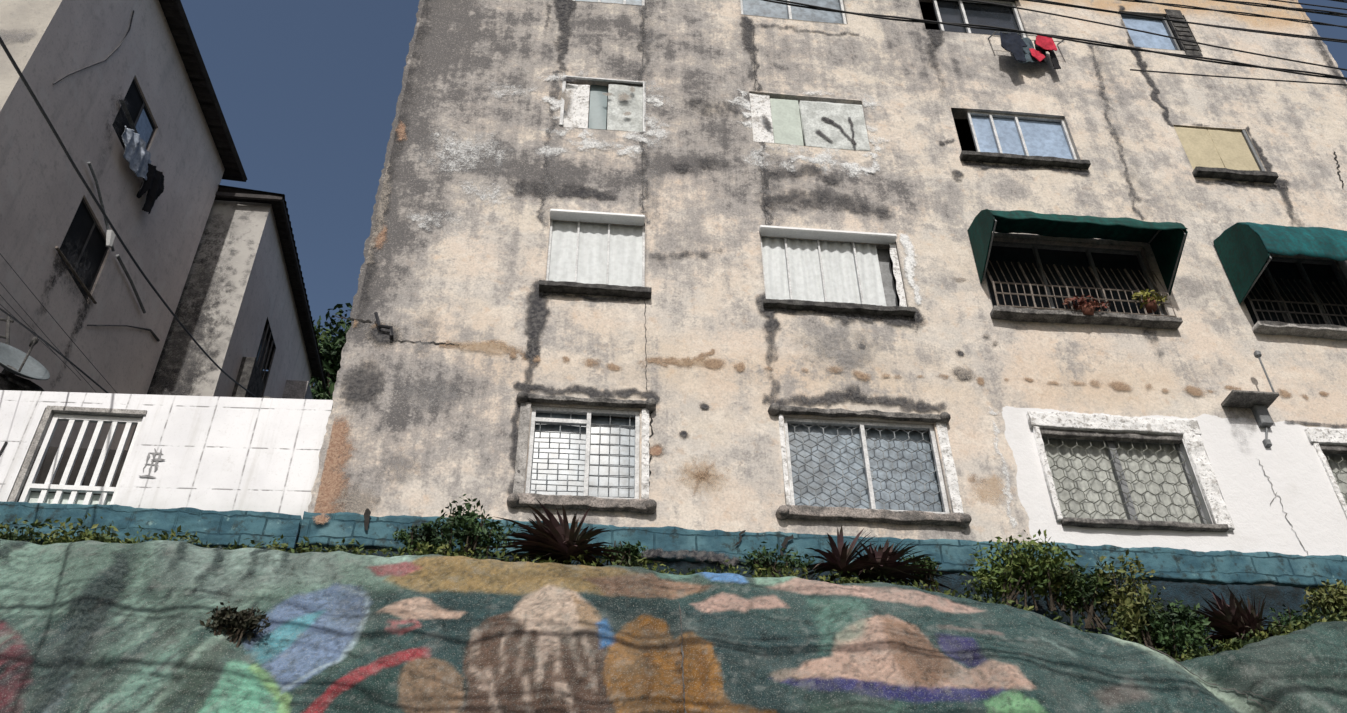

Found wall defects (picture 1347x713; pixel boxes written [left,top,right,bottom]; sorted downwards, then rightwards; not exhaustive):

peeling [495,75,667,156]
water stain [638,1,651,98]
water stain [674,157,715,173]
peeling [729,91,773,129]
peeling [745,117,888,177]
water stain [1090,45,1143,219]
water stain [1119,5,1173,126]
water stain [147,220,232,396]
crack [335,316,463,346]
water stain [508,280,660,494]
water stain [756,293,945,413]
crack [1258,459,1308,554]